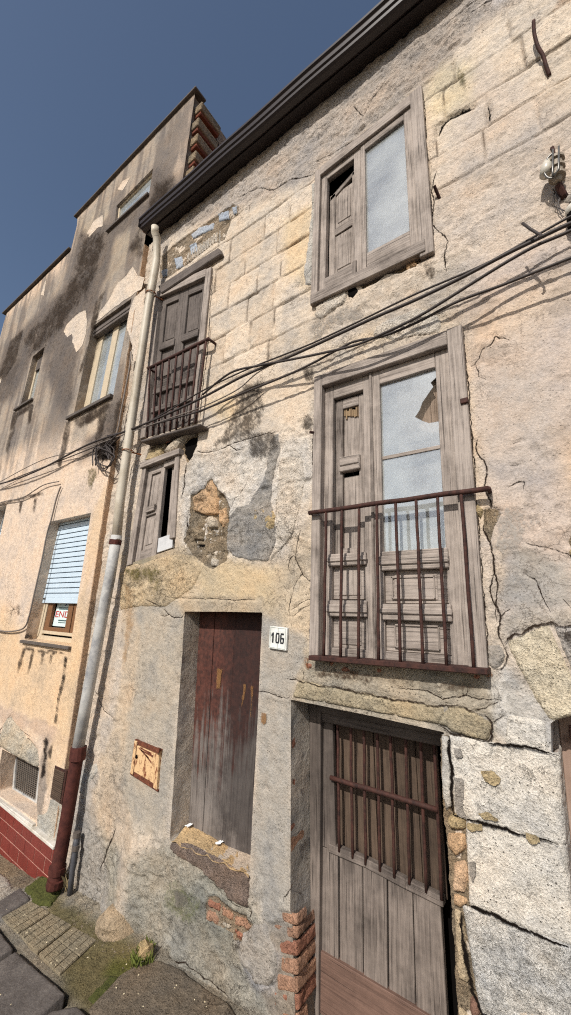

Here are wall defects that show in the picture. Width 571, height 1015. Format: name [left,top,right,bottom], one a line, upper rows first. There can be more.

flaking render [87,215,103,237]
flaking render [159,204,238,278]
flaking render [64,267,145,363]
leakage [0,330,22,379]
leakage [6,404,33,450]
leakage [58,399,122,466]
leakage [248,432,277,457]
spalling [183,479,230,569]
crack [464,335,571,670]
crack [288,530,310,630]
leakage [18,648,66,723]
crack [260,673,504,742]